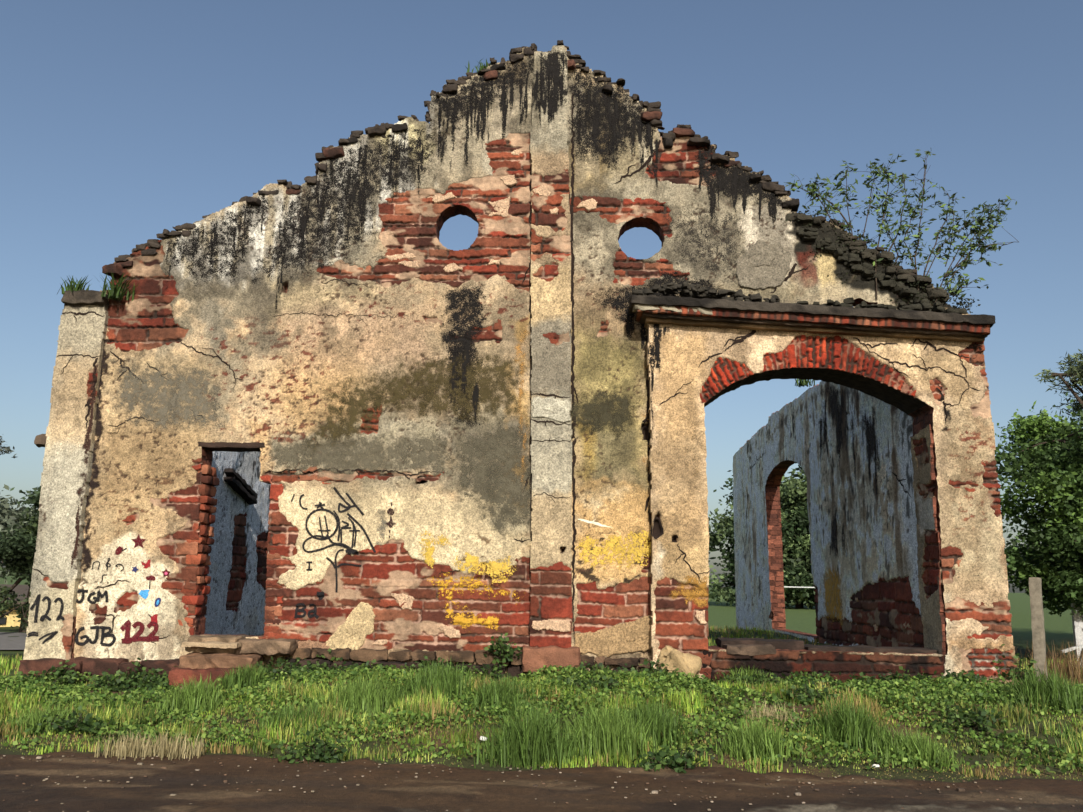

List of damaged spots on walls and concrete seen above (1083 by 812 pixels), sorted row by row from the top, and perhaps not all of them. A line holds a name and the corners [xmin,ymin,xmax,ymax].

leakage [160,50,659,317]
spalling [317,133,672,292]
crack [62,311,103,321]
spalling [106,239,189,352]
crack [178,341,242,392]
leakage [268,283,532,535]
crack [514,93,578,645]
spalling [700,335,917,404]
leakage [812,385,881,490]
crack [853,337,982,425]
spalling [226,460,1017,683]
leakage [824,506,847,625]